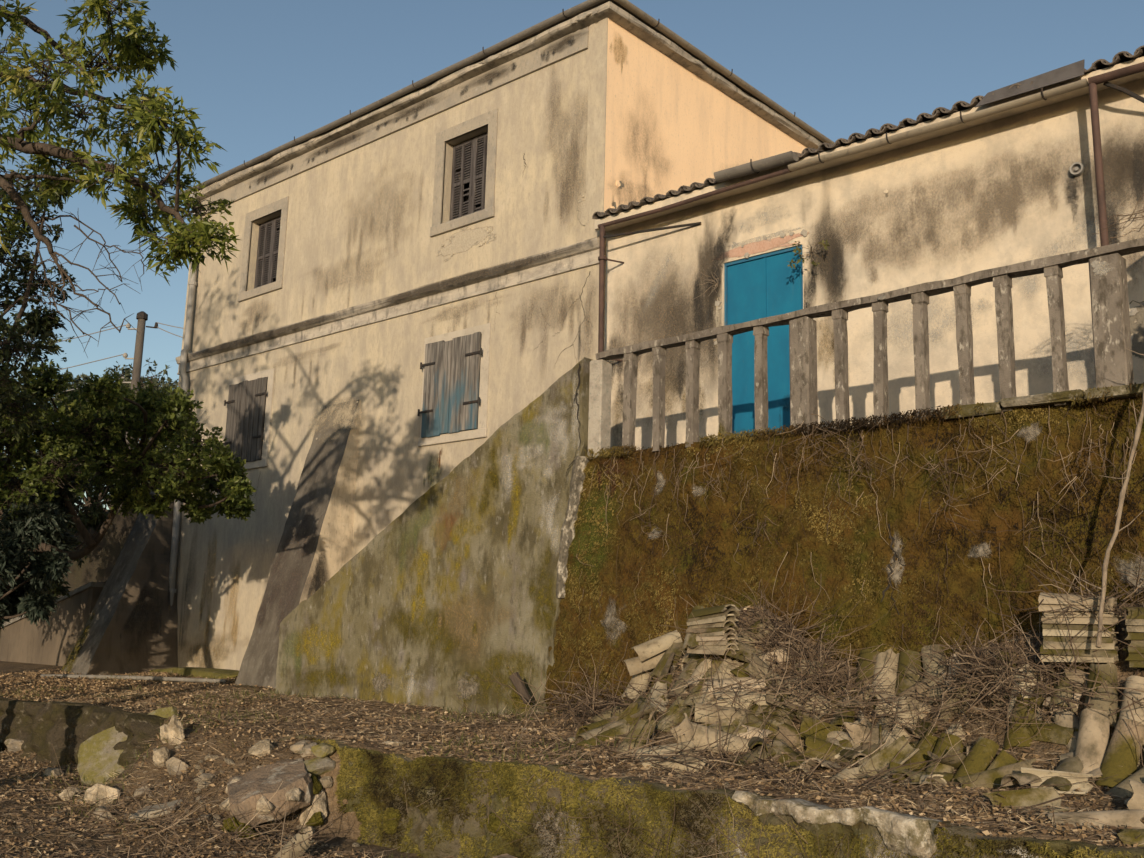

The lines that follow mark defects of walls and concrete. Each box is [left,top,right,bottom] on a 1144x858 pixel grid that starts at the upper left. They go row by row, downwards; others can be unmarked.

leakage [1052,139,1144,252]
spalling [715,229,808,260]
leakage [804,218,857,309]
leakage [190,640,222,668]